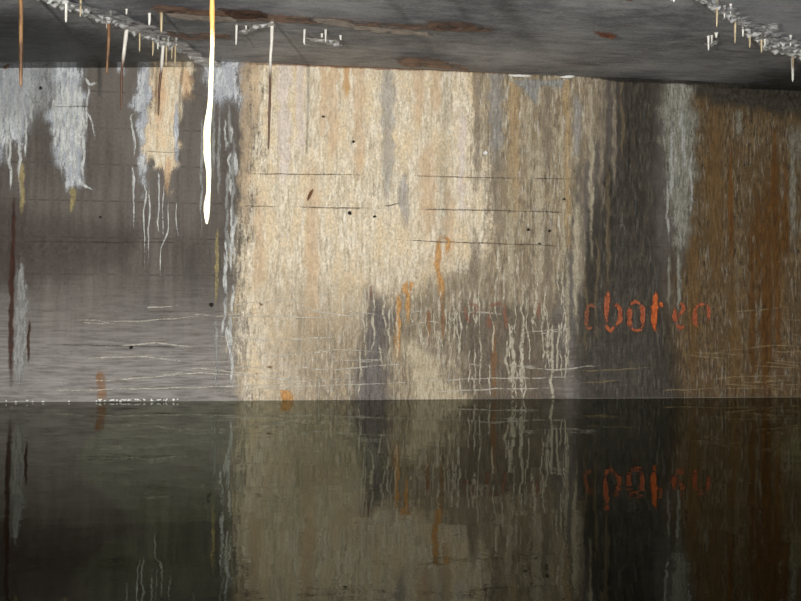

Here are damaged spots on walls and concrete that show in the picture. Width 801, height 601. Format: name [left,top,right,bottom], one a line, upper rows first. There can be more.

crack [37,0,222,68]
corrosion [147,28,230,40]
corrosion [150,5,495,36]
corrosion [261,57,478,72]
crack [697,0,801,61]
leakage [0,15,801,401]
corrosion [434,236,451,294]
corrosion [592,77,801,398]
corrosion [396,281,413,350]